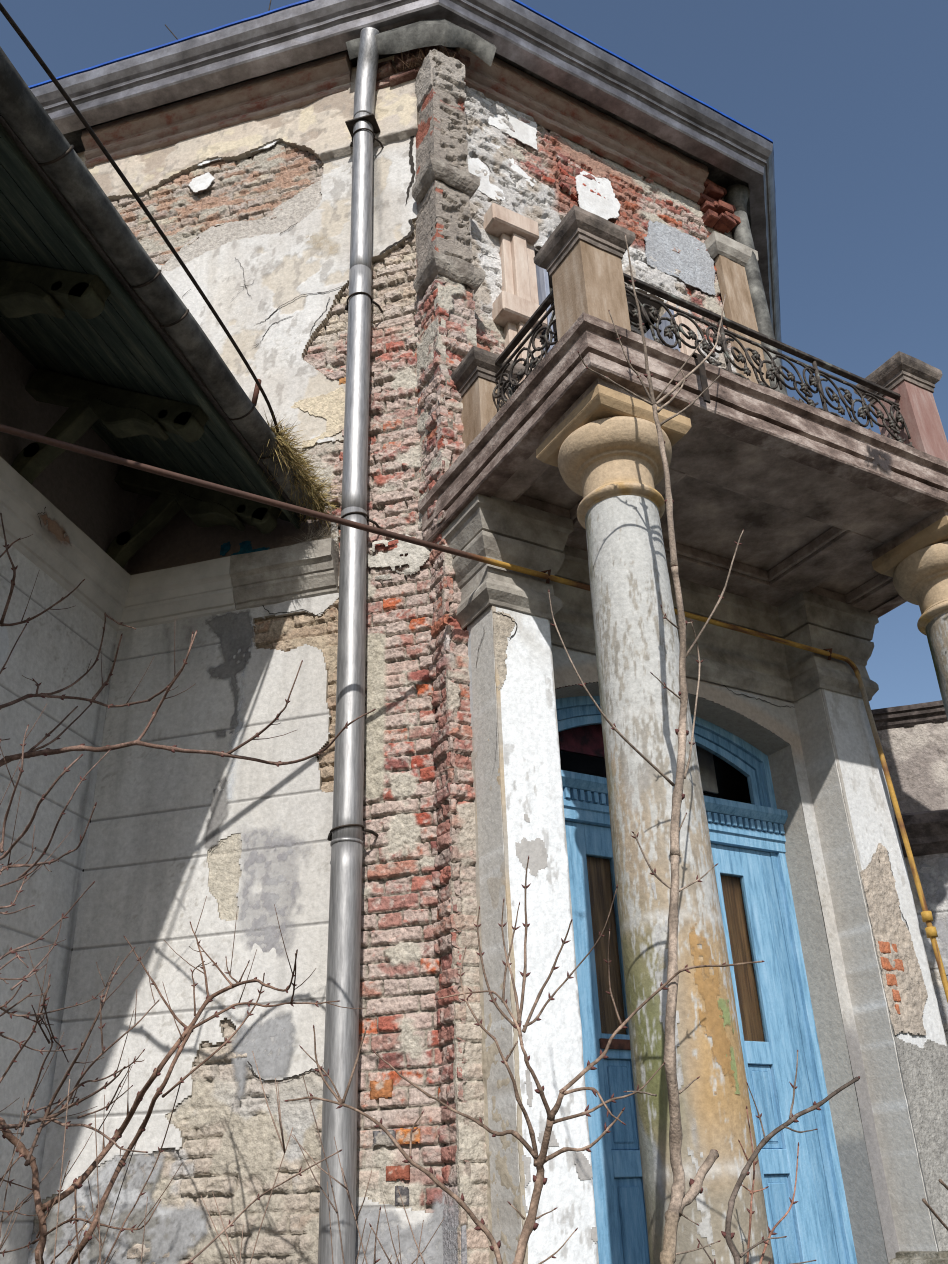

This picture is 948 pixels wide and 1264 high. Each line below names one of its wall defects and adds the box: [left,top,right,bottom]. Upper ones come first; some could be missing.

flaking render [112,140,324,271]
flaking render [696,179,741,234]
crack [232,258,348,346]
flaking render [304,287,349,385]
flaking render [300,429,344,563]
water stain [206,611,254,746]
flaking render [254,600,339,793]
flaking render [356,221,446,1213]
water stain [205,763,234,848]
water stain [240,830,298,955]
flaking render [860,843,928,1035]